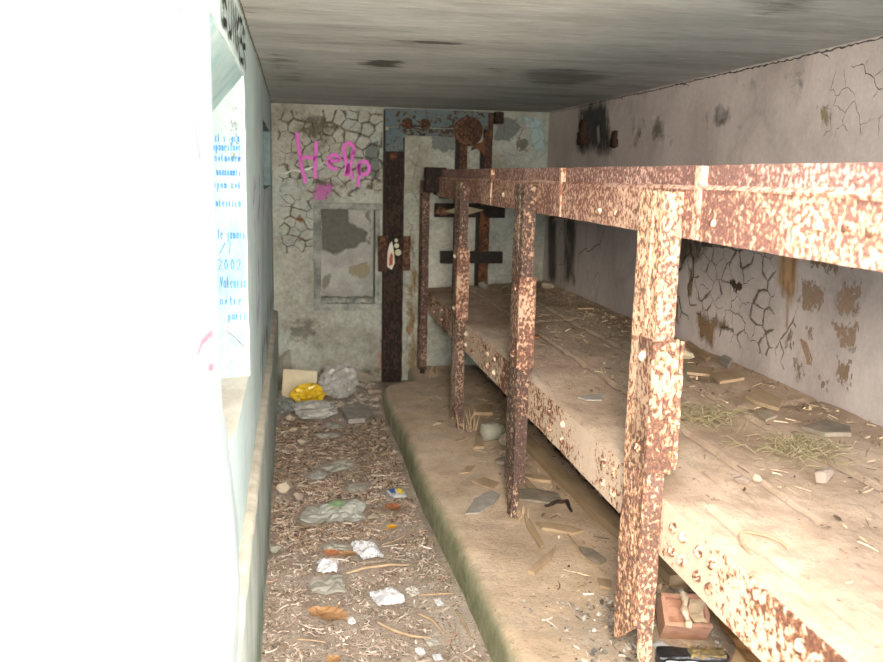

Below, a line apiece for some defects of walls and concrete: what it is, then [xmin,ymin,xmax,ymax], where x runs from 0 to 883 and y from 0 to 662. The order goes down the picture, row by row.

crack [239,0,383,253]
crack [487,36,883,159]
corrosion [698,312,726,347]
crack [677,238,796,369]
corrosion [779,256,796,296]